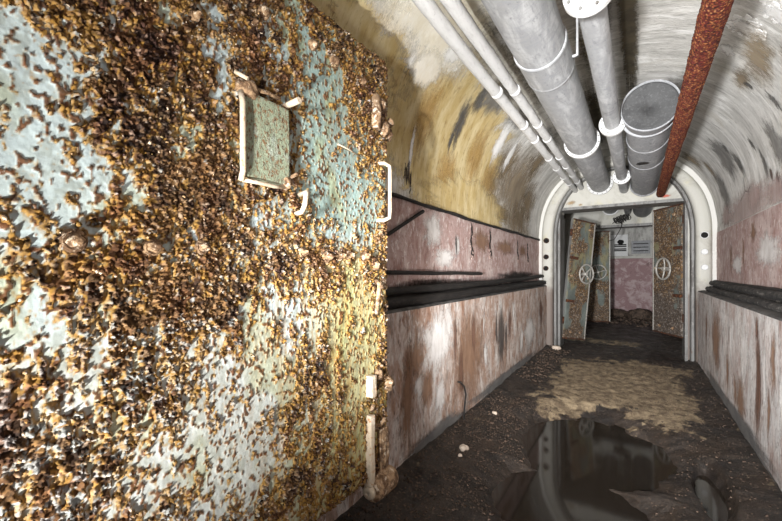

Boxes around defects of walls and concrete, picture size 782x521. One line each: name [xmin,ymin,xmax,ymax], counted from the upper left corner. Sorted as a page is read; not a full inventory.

water stain [308,0,558,267]
corrosion [0,0,389,521]
water stain [757,231,782,268]
water stain [408,305,466,457]
water stain [496,305,514,359]
water stain [476,318,535,401]
water stain [707,372,777,485]